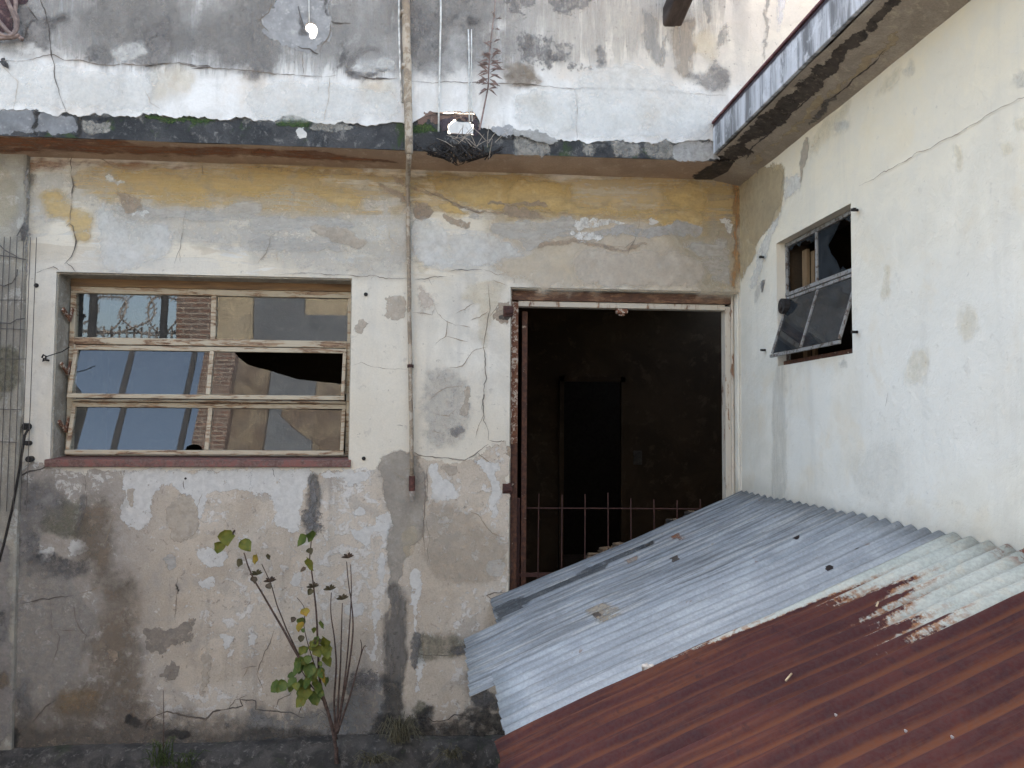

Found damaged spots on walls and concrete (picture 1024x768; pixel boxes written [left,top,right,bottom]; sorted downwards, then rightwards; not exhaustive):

crack [4,0,705,131]
water stain [517,32,606,71]
water stain [763,0,785,47]
peeling [0,108,111,138]
water stain [799,138,808,181]
crack [863,97,1024,184]
crack [37,158,77,273]
peeling [538,220,729,284]
crack [258,217,509,561]
water stain [0,497,504,748]
peeling [15,440,511,747]
crack [145,631,325,729]